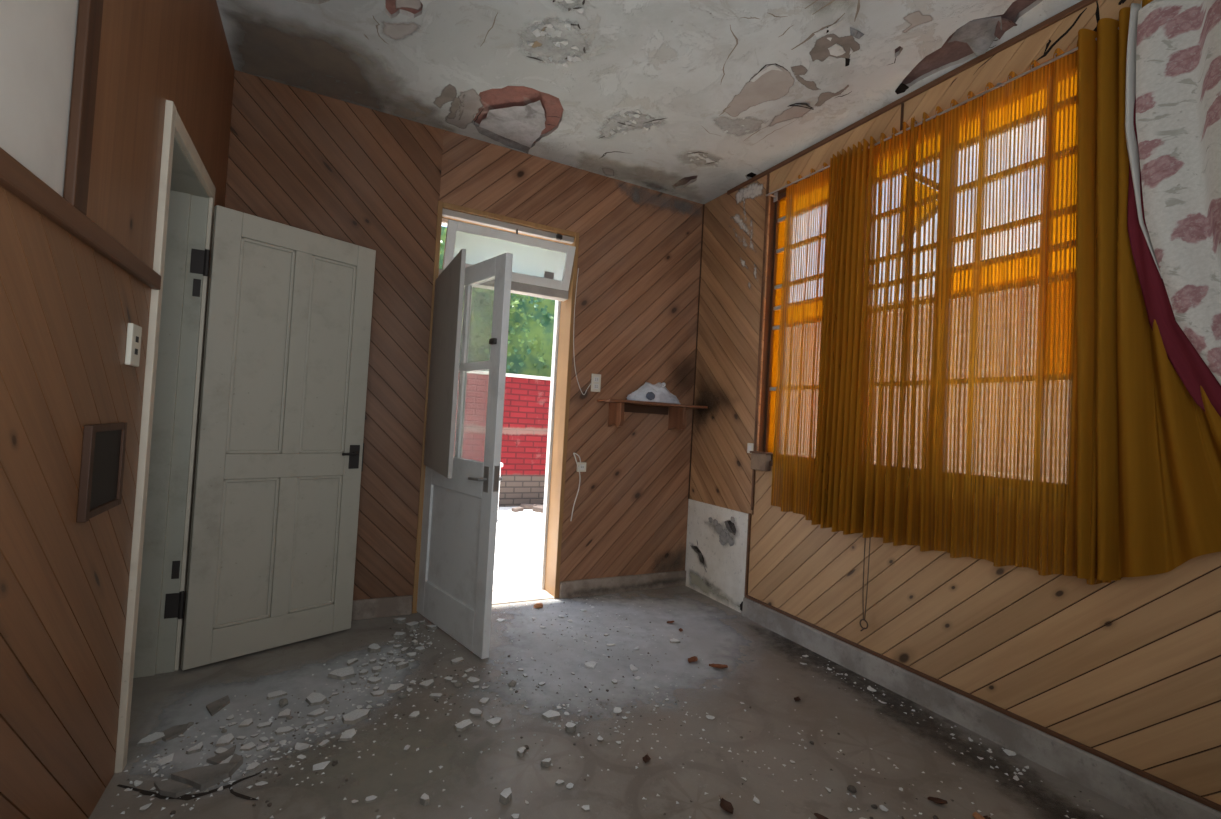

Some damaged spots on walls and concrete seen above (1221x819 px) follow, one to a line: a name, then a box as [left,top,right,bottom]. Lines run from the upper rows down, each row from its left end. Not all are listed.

peeling [523,0,590,67]
peeling [719,0,864,126]
spalling [906,53,976,87]
peeling [434,84,483,129]